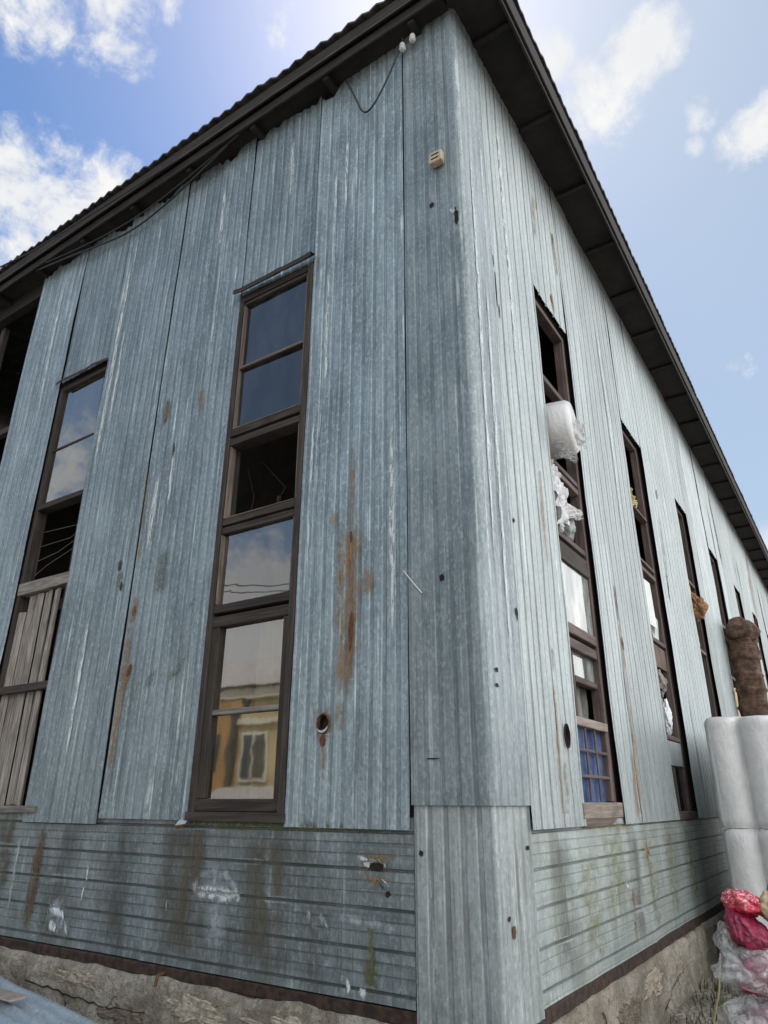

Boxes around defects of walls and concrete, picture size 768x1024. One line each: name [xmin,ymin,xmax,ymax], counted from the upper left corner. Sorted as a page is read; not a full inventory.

rust [337,465,372,683]
rust [23,835,44,924]